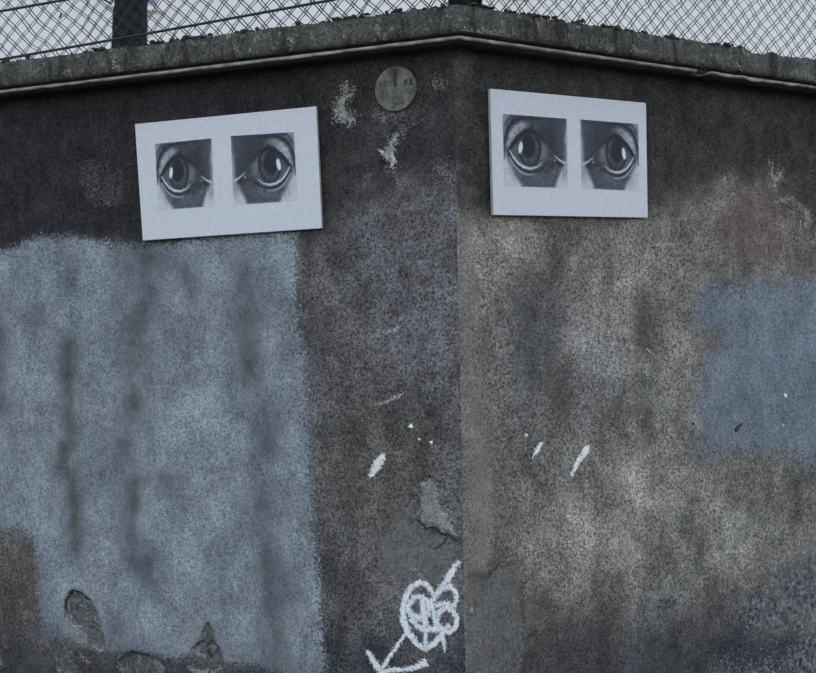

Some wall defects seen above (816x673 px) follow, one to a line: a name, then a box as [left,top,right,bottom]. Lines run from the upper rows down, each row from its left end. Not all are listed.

water stain [0,49,816,284]
peeling [374,475,463,593]
spalling [50,588,108,673]
spalling [117,649,167,673]
spalling [187,622,226,673]